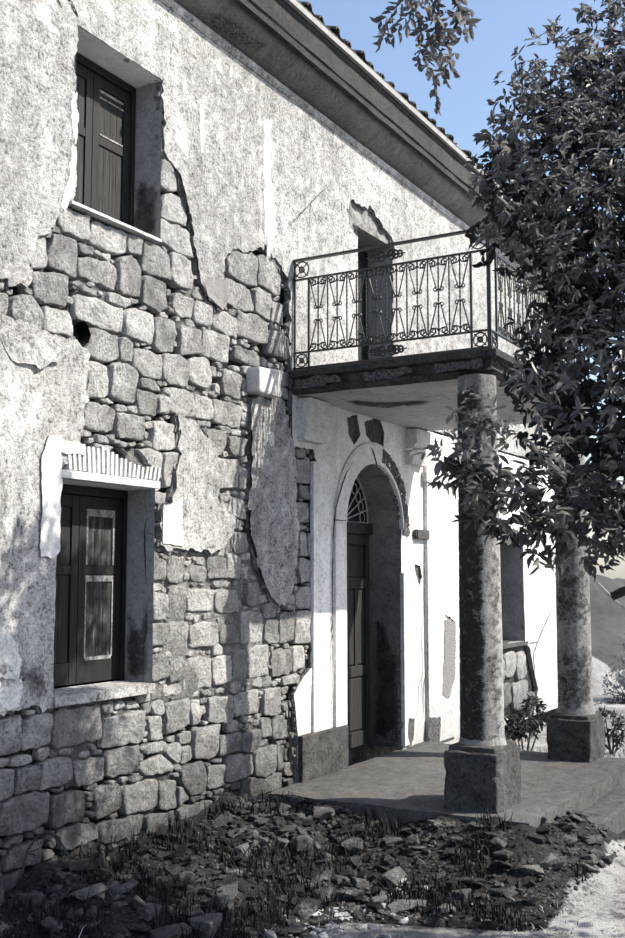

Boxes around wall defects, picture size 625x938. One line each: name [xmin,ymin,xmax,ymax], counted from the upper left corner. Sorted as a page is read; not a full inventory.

damp [127,615,147,677]
flaking render [0,92,342,892]
damp [457,385,497,475]
damp [458,476,503,741]